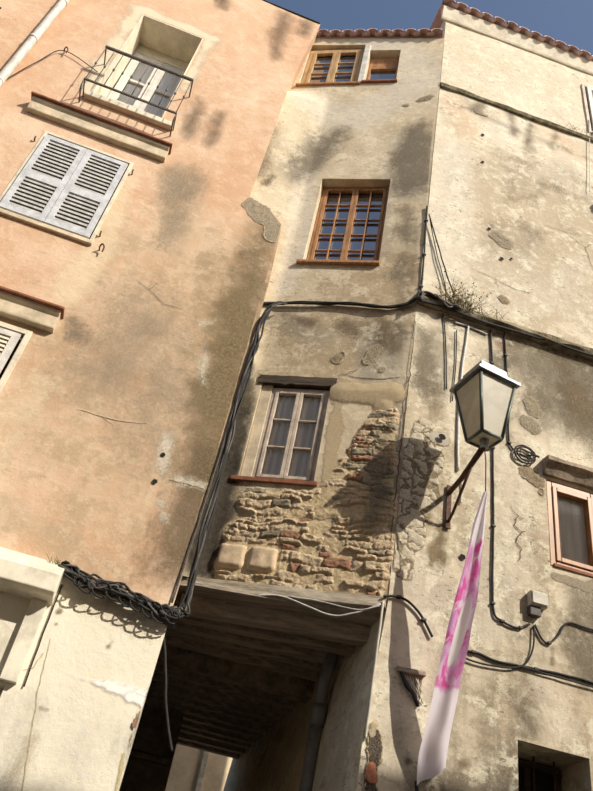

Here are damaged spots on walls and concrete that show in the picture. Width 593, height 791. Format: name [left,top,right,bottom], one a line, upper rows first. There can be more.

damp [390,123,432,195]
spalling [242,197,281,242]
damp [157,267,266,577]
flaking render [211,406,451,597]
crack [511,507,526,561]
crack [21,638,51,791]
peeling [84,678,147,747]
spalling [362,720,383,791]